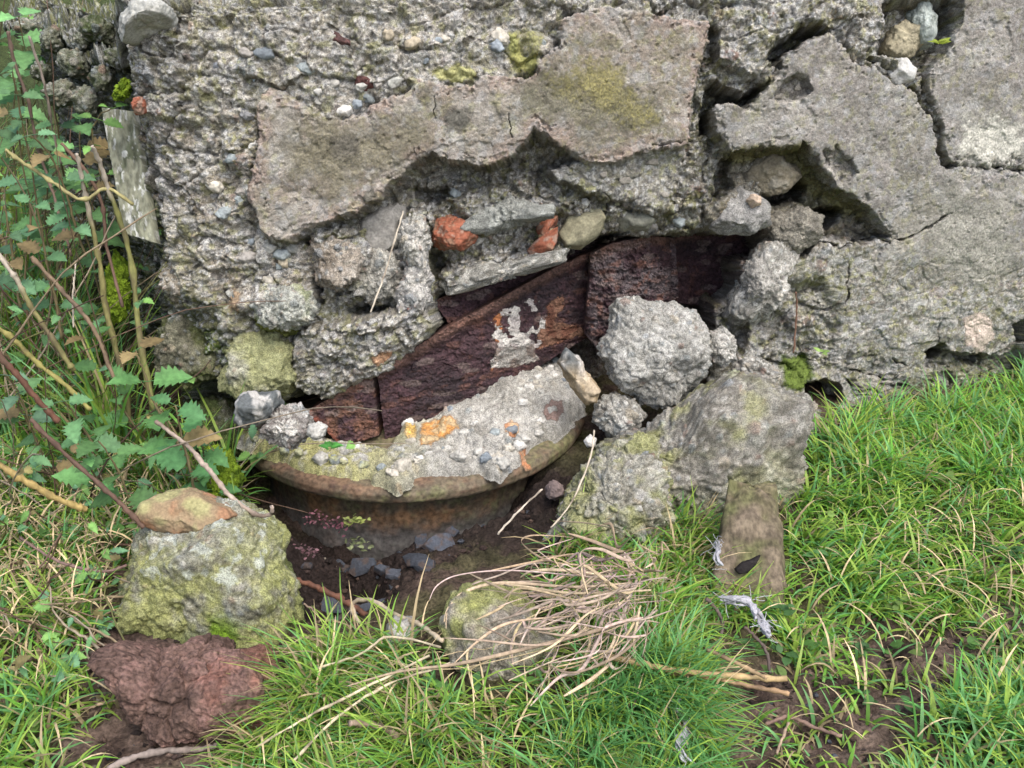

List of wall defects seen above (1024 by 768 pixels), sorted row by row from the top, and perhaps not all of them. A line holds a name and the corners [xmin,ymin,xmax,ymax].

spalling [143,0,956,346]
rust [491,308,505,370]
rust [537,297,584,350]
spalling [550,338,609,379]
rust [404,416,459,445]
rust [505,420,519,438]
rust [543,400,564,421]